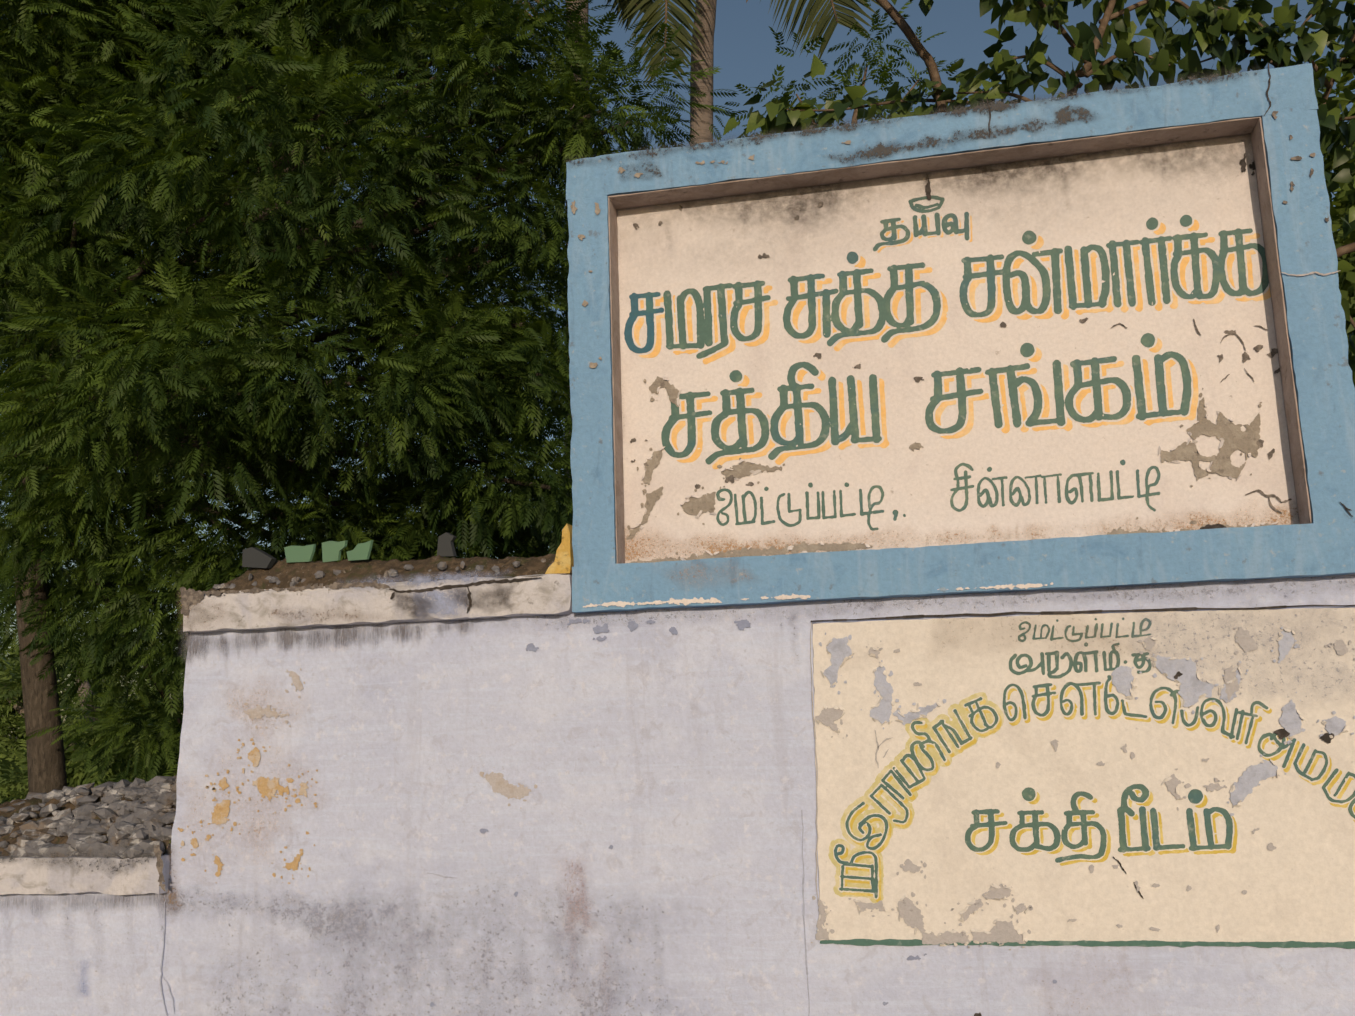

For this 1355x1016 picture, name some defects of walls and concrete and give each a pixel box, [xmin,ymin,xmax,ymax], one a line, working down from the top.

peeling [643,375,682,407]
peeling [1158,388,1275,487]
peeling [627,438,665,540]
peeling [677,458,785,525]
crack [389,577,542,613]
peeling [814,632,946,739]
peeling [1111,627,1300,714]
peeling [1274,692,1355,744]
peeling [178,703,318,884]
peeling [479,767,537,806]
peeling [1161,754,1286,816]
peeling [848,883,1033,960]